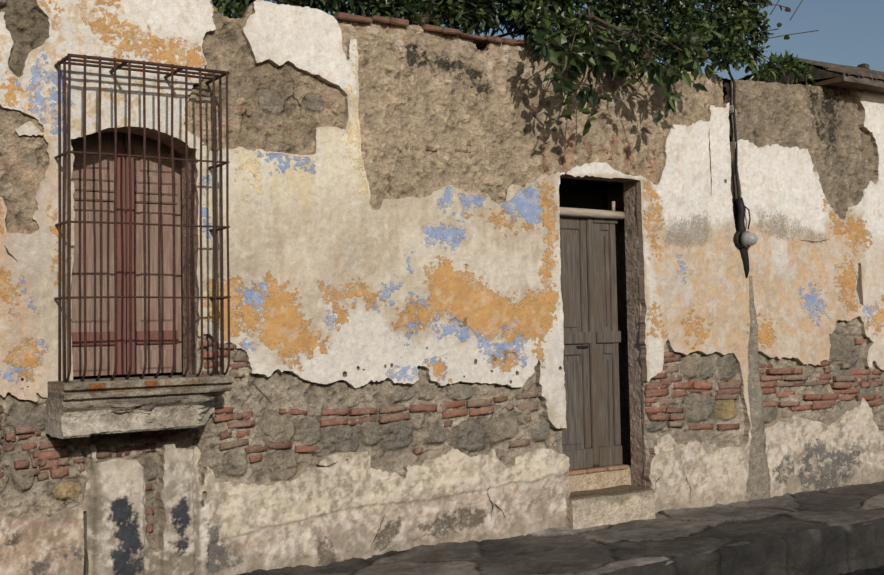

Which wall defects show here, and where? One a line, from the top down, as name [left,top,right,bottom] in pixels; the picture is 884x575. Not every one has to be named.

flaking render [0,0,73,286]
flaking render [81,0,875,375]
flaking render [0,268,563,550]
flaking render [641,302,745,468]
flaking render [758,255,884,426]
damp [110,496,144,575]
damp [171,497,191,556]